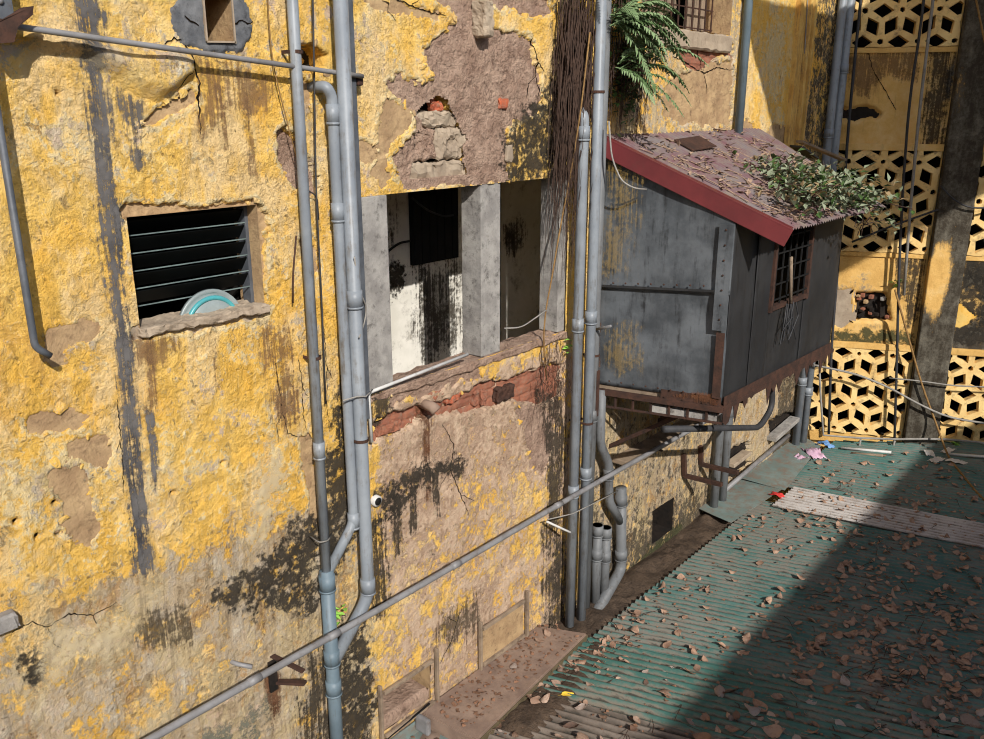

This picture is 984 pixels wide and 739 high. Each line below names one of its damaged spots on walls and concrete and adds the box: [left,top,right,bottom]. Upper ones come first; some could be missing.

crack [165,16,202,134]
spalling [359,0,551,189]
crack [673,30,728,86]
leakage [62,0,159,578]
leakage [389,258,463,364]
spalling [835,288,890,328]
peeling [26,401,113,550]
leakage [211,374,358,623]
crack [438,426,474,514]
spalling [368,362,561,476]
crack [12,603,115,648]
leakage [339,451,468,739]